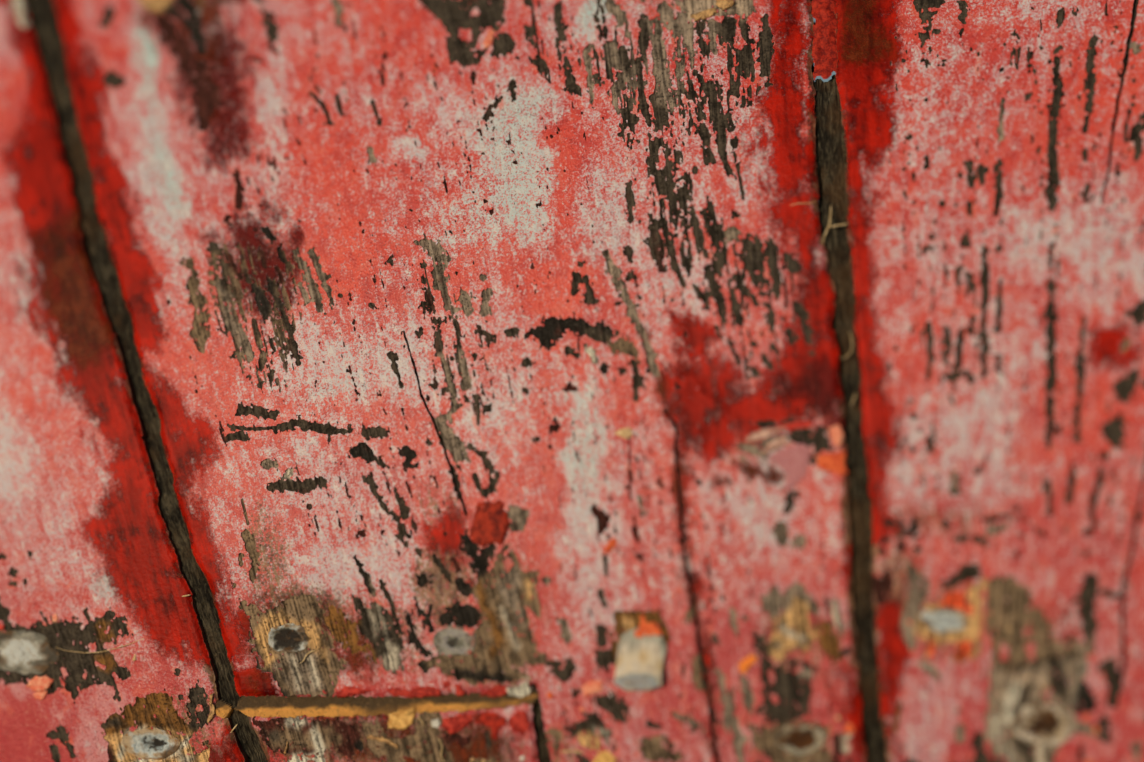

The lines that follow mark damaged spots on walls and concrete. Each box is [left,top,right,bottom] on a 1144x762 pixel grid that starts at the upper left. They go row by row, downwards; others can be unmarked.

crack [1101,0,1138,204]
peeling [179,0,855,762]
peeling [872,0,1144,745]
peeling [0,552,27,589]
peeling [0,597,210,762]
crack [664,408,720,762]
crack [1115,470,1144,707]